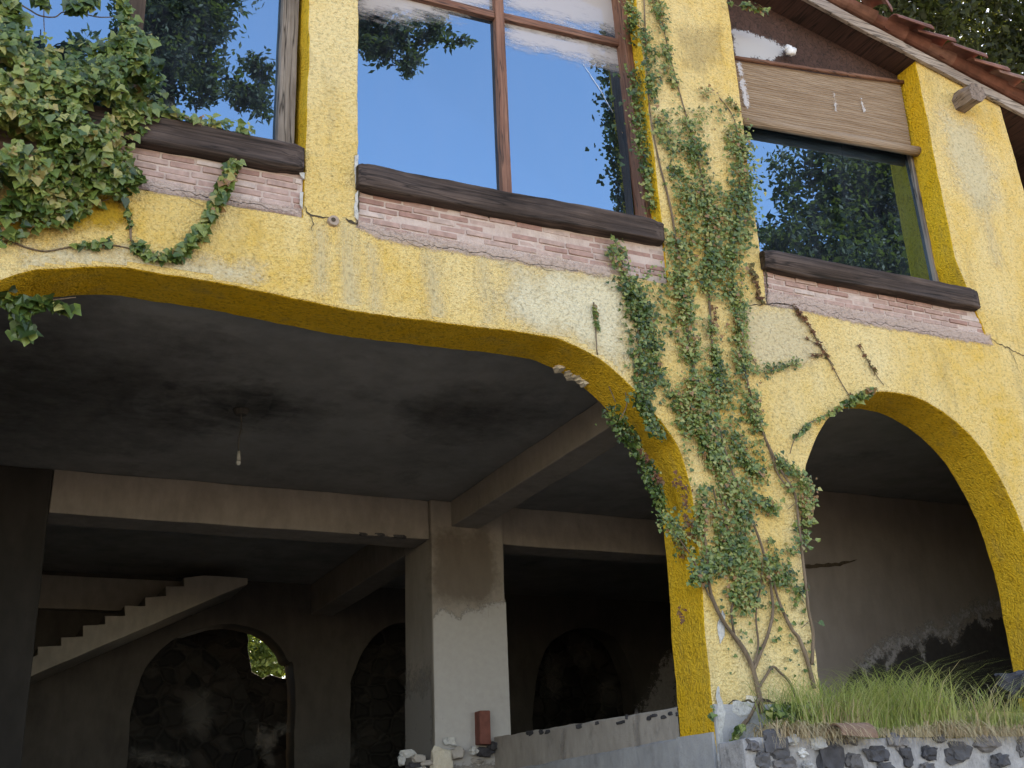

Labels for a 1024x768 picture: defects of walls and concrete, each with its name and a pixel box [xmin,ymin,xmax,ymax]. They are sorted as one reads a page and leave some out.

flaking render [552,365,589,388]
crack [805,559,857,569]